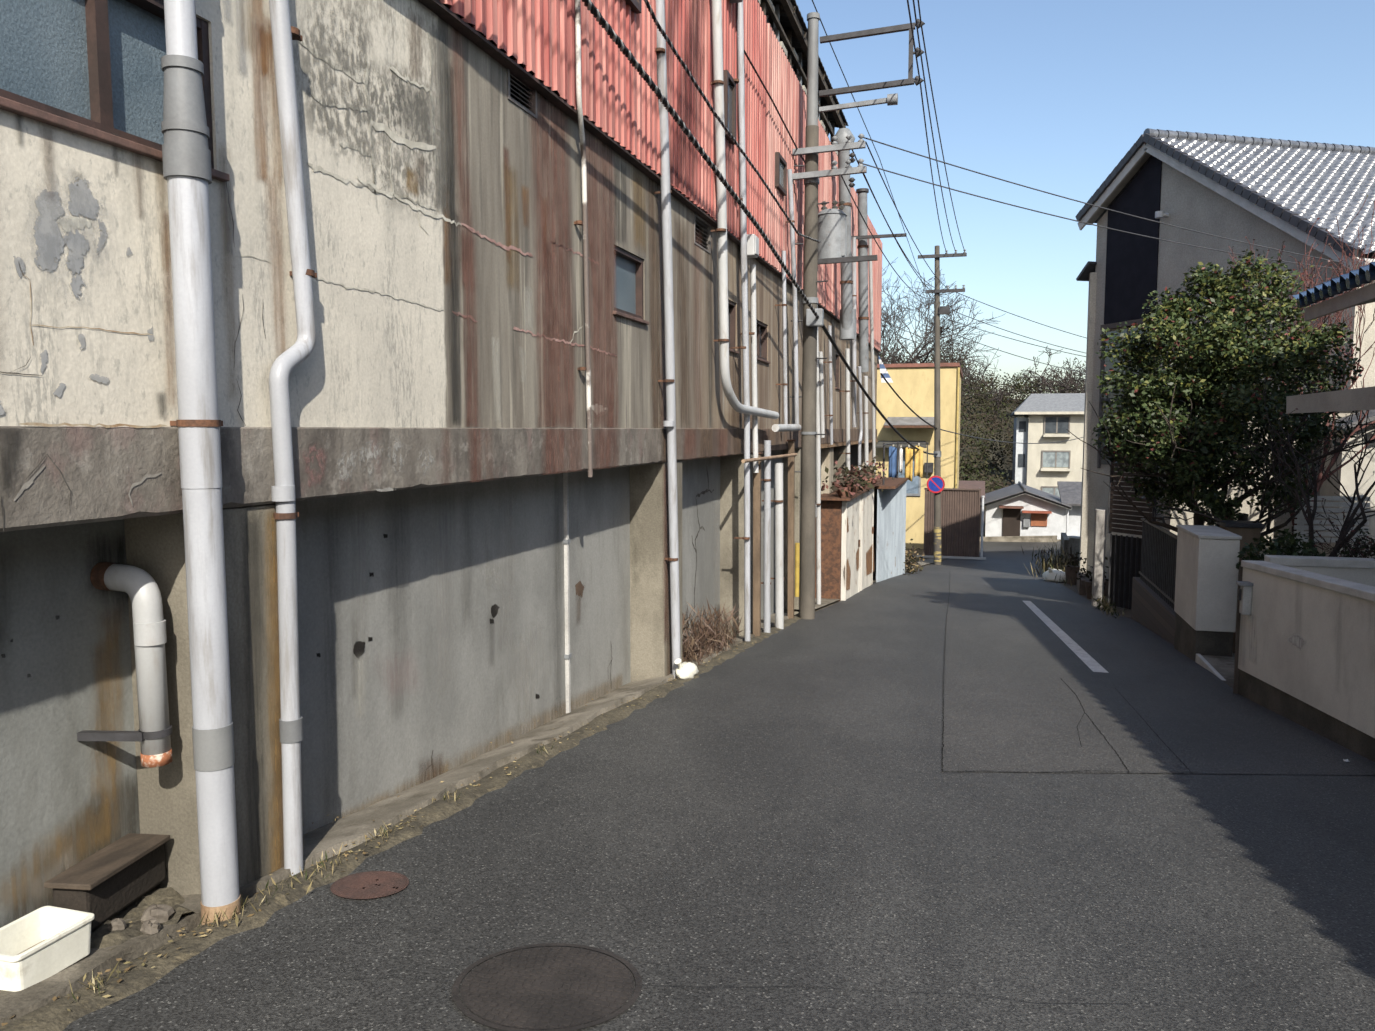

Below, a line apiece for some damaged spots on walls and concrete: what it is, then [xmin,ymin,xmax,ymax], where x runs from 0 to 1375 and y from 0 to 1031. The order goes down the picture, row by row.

water stain [306,12,452,210]
peeling [13,177,108,299]
crack [357,176,598,264]
rust [504,89,574,425]
peeling [40,350,48,373]
peeling [89,374,109,384]
rust [90,562,120,591]
water stain [5,778,140,925]